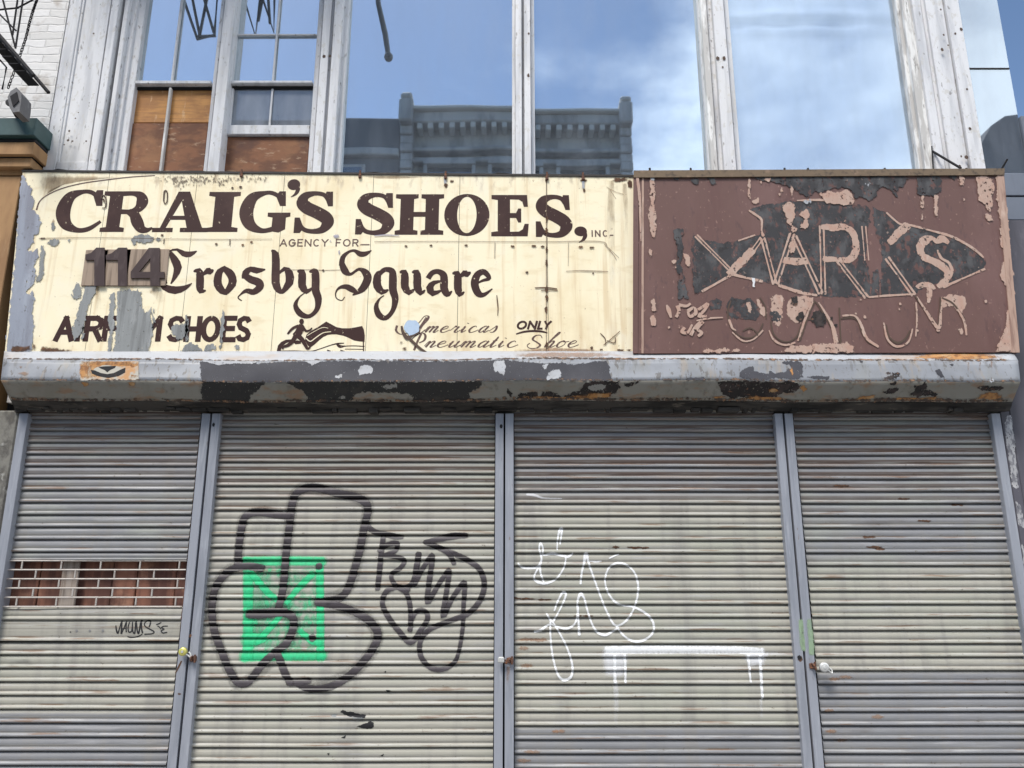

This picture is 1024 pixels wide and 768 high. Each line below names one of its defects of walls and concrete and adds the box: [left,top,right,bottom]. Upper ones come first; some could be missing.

peeling [5,175,97,352]
peeling [108,288,156,352]
peeling [131,234,162,245]
peeling [171,311,639,403]
peeling [636,178,657,256]
peeling [650,228,837,337]
rust [749,389,782,400]
peeling [747,155,1015,293]
peeling [916,288,967,313]
peeling [996,309,1018,352]